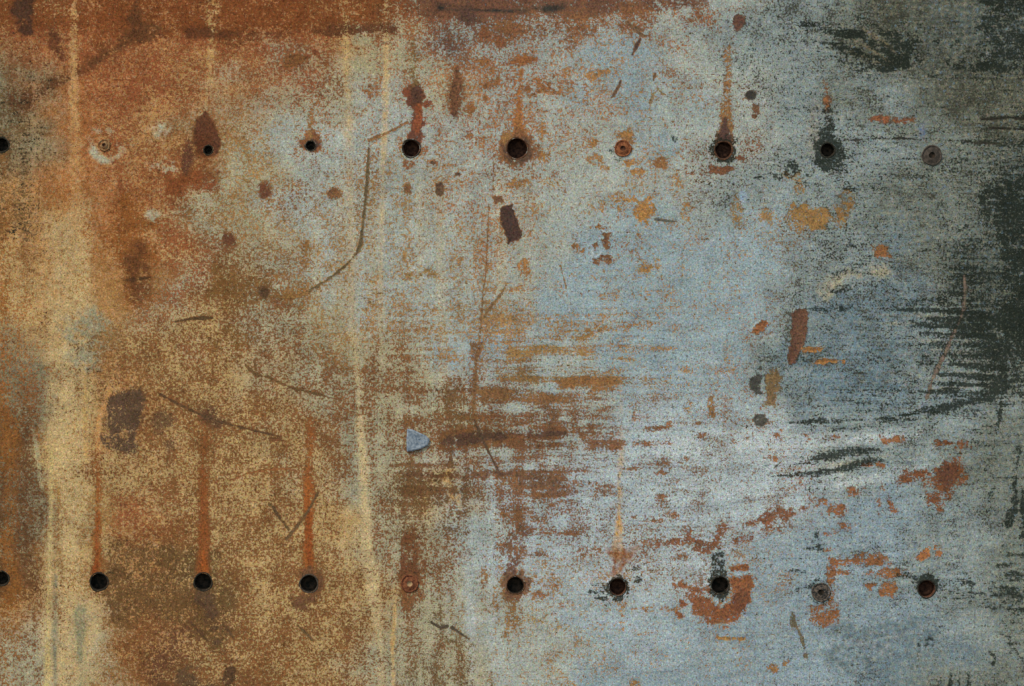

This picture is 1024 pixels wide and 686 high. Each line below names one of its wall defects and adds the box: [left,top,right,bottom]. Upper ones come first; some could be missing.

corrosion [95,110,225,316]
corrosion [200,229,319,354]
corrosion [0,0,746,284]
corrosion [727,186,859,239]
corrosion [78,379,254,686]
corrosion [286,408,327,616]
corrosion [363,306,982,655]
corrosion [765,656,791,676]